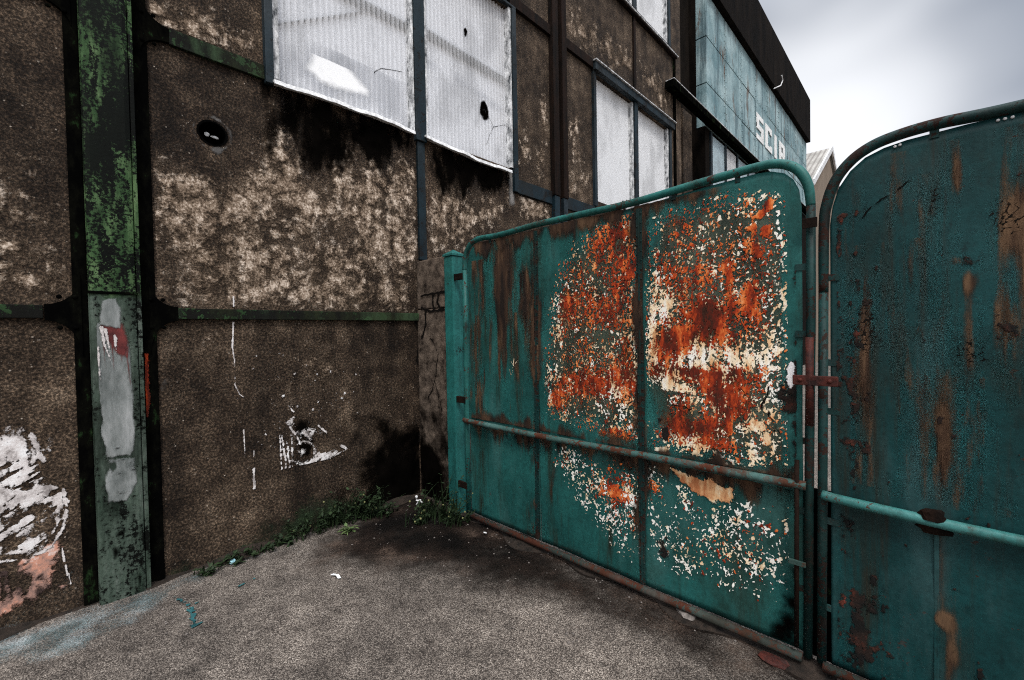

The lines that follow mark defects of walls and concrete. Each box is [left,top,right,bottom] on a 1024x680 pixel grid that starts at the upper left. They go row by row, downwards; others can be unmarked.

damp [431,148,514,203]
rust [999,173,1024,297]
rust [963,256,979,368]
rust [470,188,797,589]
rust [837,279,872,490]
damp [357,410,449,512]
peeling [555,447,789,598]
rust [838,575,894,672]
rust [935,610,958,679]